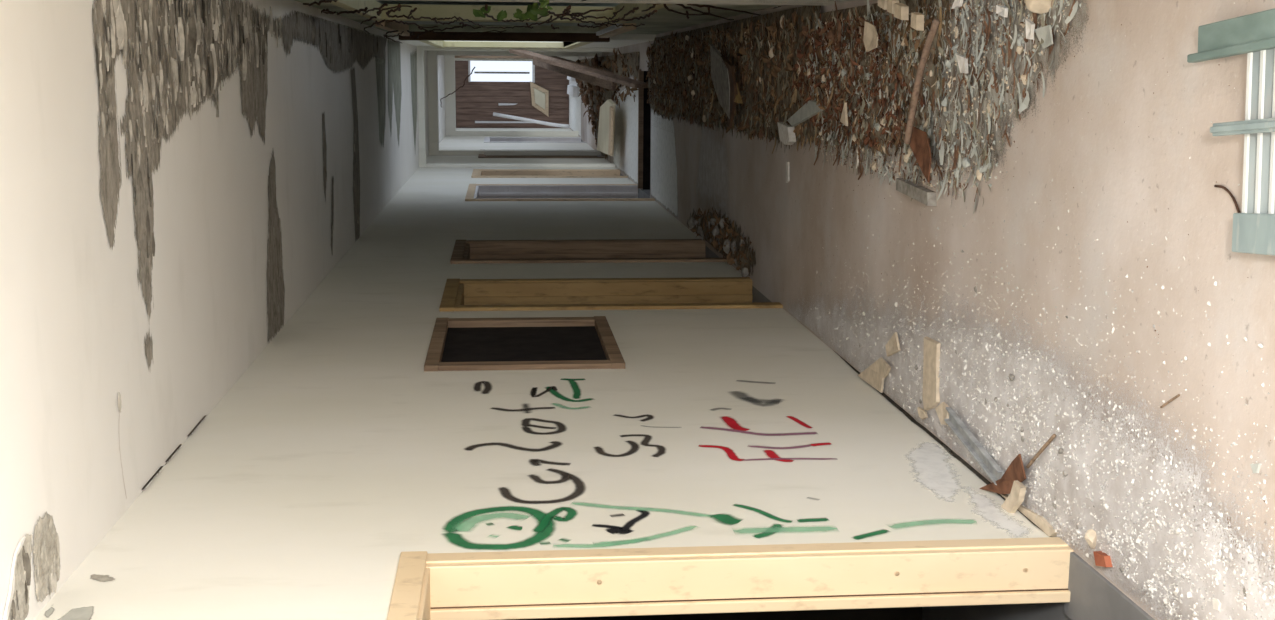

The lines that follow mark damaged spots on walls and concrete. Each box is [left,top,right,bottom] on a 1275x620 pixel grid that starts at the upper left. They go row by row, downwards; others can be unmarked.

peeling [92,0,387,318]
peeling [3,512,93,620]
peeling [90,574,114,582]